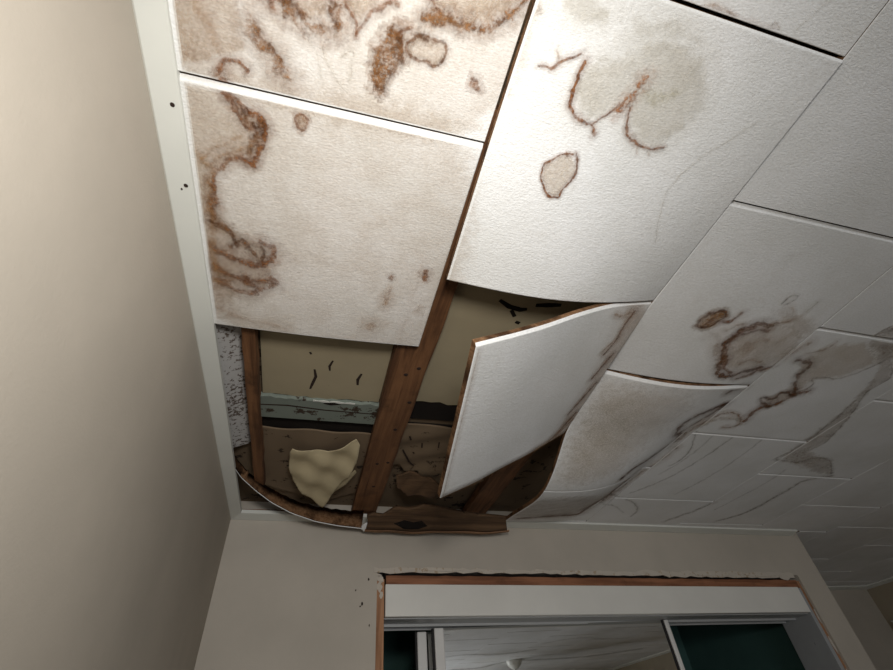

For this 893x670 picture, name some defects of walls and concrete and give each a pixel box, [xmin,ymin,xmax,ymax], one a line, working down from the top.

damp [246,19,291,80]
damp [271,0,324,33]
damp [329,0,399,34]
damp [371,24,447,94]
damp [420,0,528,34]
damp [539,53,664,150]
damp [207,58,279,295]
damp [540,152,578,198]
spalling [216,324,509,534]
damp [517,309,812,519]